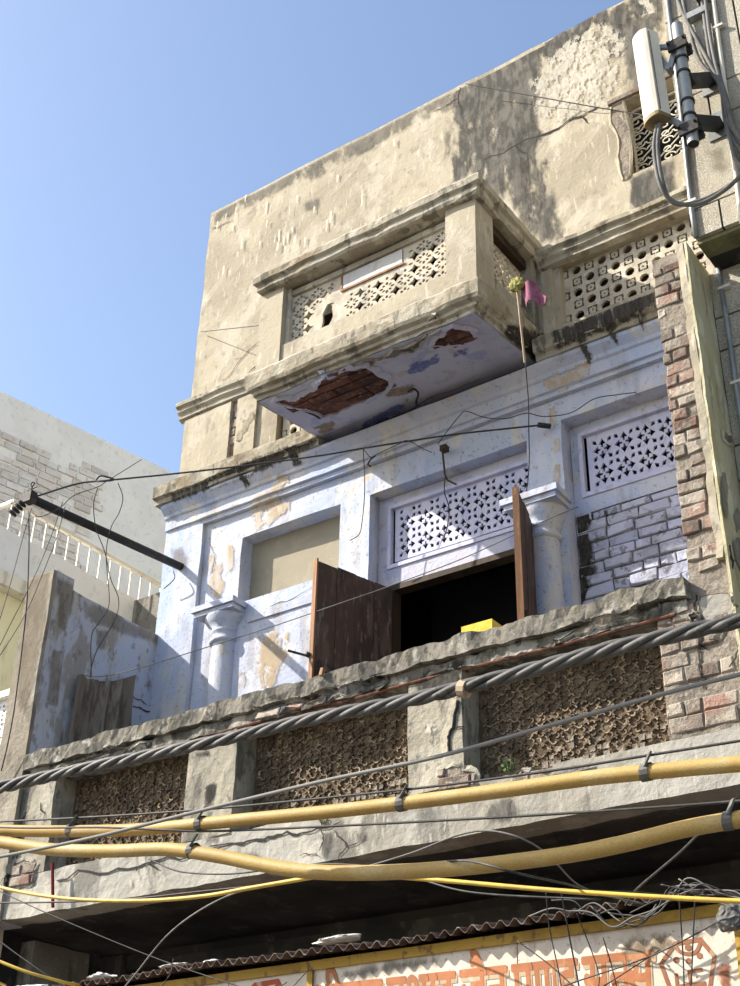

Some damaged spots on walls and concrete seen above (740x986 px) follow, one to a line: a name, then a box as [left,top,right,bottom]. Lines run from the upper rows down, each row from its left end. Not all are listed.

water stain [214,0,662,242]
crack [484,106,599,160]
water stain [630,162,674,208]
water stain [274,226,306,254]
water stain [505,292,656,363]
spalling [267,313,483,419]
peeling [196,474,290,530]
peeling [256,632,288,688]
spalling [252,672,389,720]
crack [440,698,464,753]
crack [210,820,361,858]
crack [57,856,187,881]